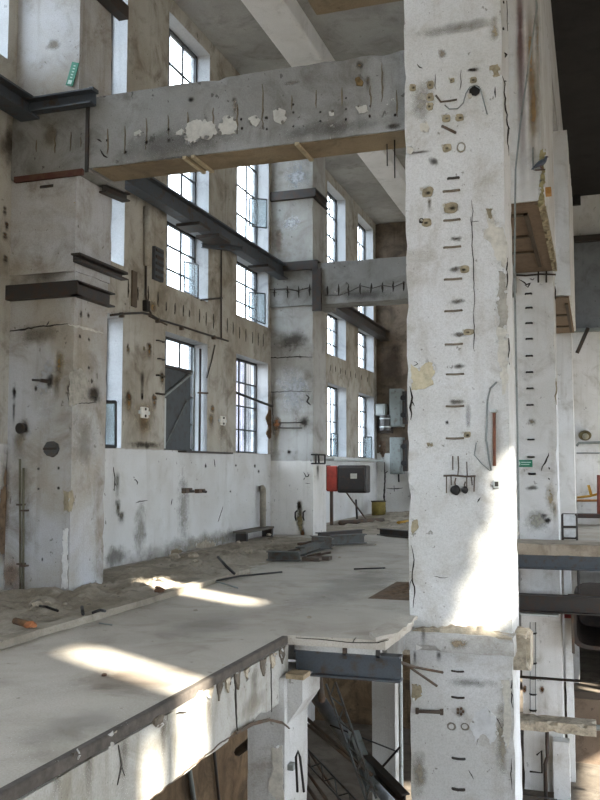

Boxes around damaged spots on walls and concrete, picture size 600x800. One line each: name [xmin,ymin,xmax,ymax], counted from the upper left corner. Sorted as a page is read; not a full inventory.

peeling [174,115,237,147]
peeling [247,115,261,127]
peeling [273,107,288,124]
crack [494,52,510,152]
crack [10,322,102,333]
peeling [408,359,436,390]
crack [408,388,416,420]
crack [408,546,416,606]
spalling [207,646,285,701]